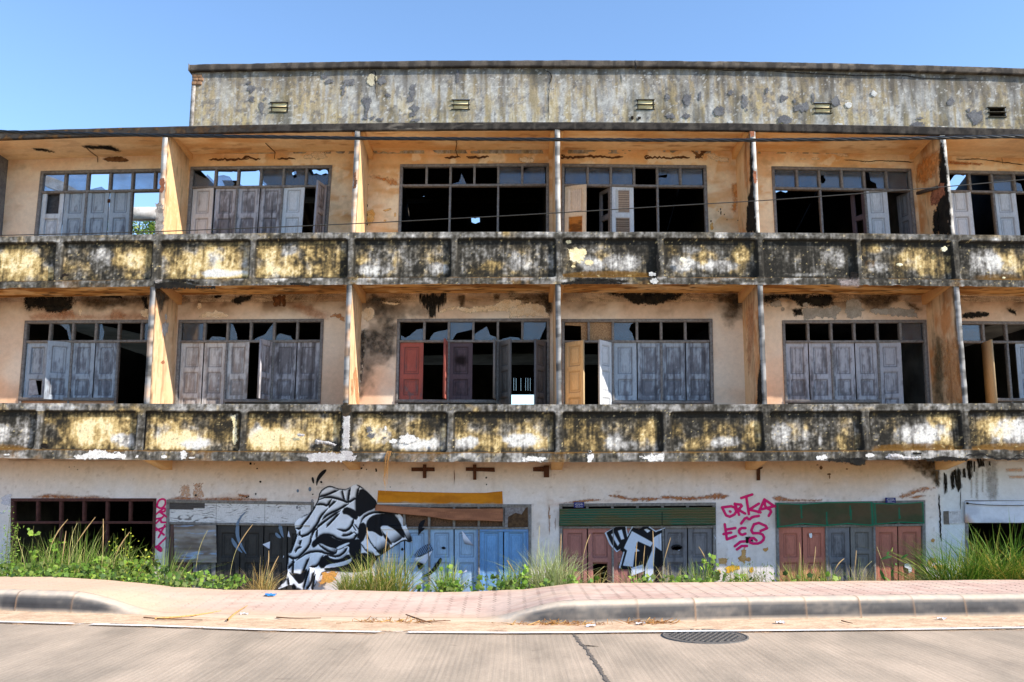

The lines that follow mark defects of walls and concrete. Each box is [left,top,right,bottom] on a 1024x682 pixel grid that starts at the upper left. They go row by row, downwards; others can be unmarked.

peeling [665,92,702,119]
peeling [778,92,815,124]
damp [933,140,952,234]
peeling [74,449,139,470]
damp [904,459,997,497]